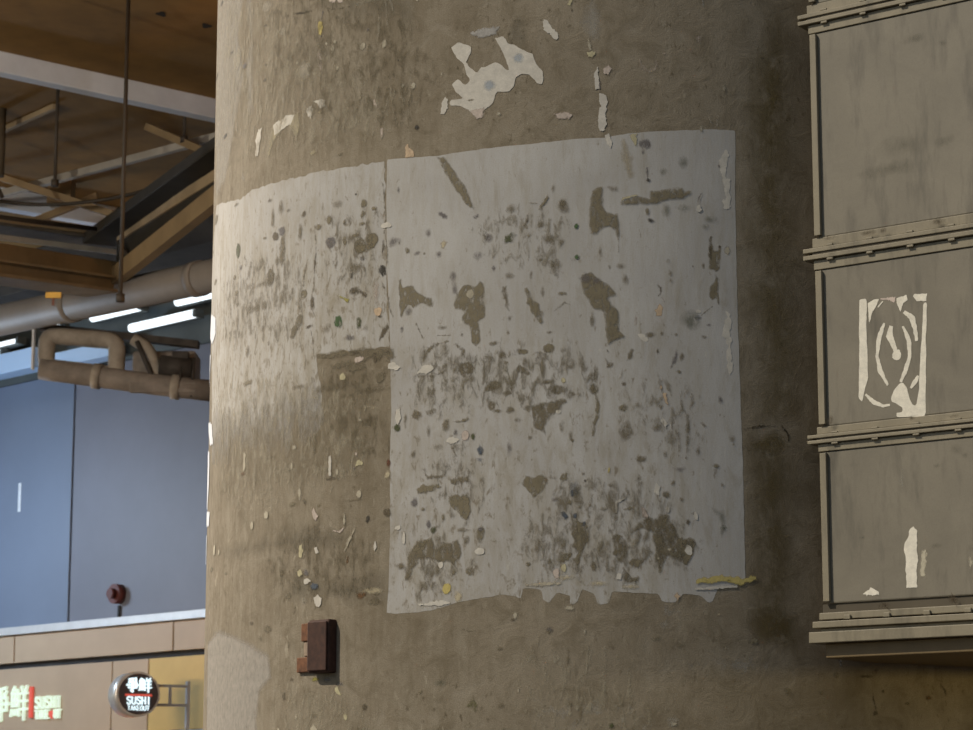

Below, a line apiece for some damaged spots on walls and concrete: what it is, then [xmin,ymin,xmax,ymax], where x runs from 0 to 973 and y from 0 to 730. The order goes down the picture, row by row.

peeling [440,26,543,120]
peeling [210,200,302,343]
peeling [315,194,392,302]
peeling [317,315,400,417]
peeling [438,157,478,217]
peeling [394,274,600,460]
peeling [582,273,624,351]
peeling [590,187,619,236]
peeling [621,170,702,222]
peeling [206,423,223,555]
peeling [395,464,484,606]
peeling [523,473,695,588]